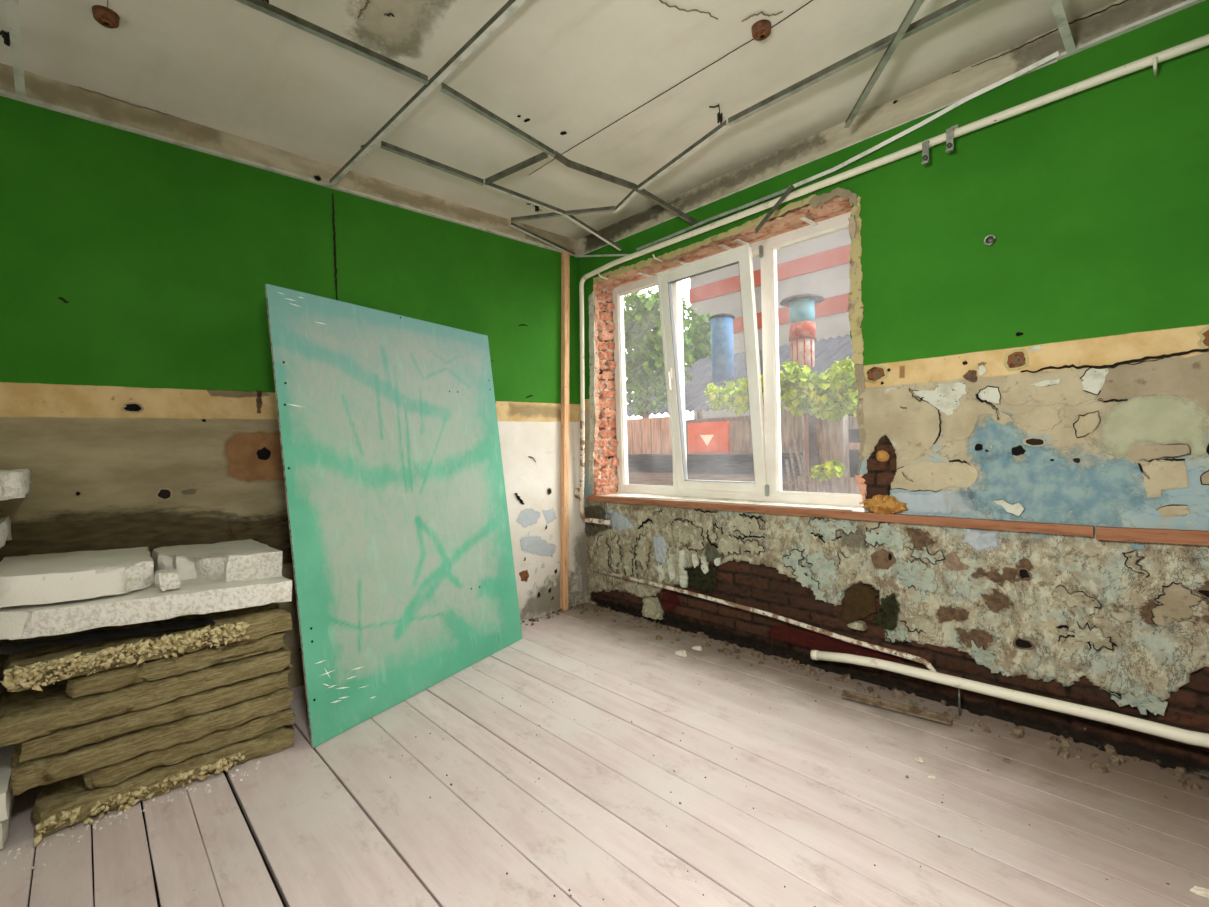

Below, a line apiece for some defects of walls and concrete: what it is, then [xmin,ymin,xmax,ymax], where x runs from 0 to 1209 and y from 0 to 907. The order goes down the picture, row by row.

leakage [356,0,428,53]
crack [529,0,813,175]
flaking render [579,187,1209,768]